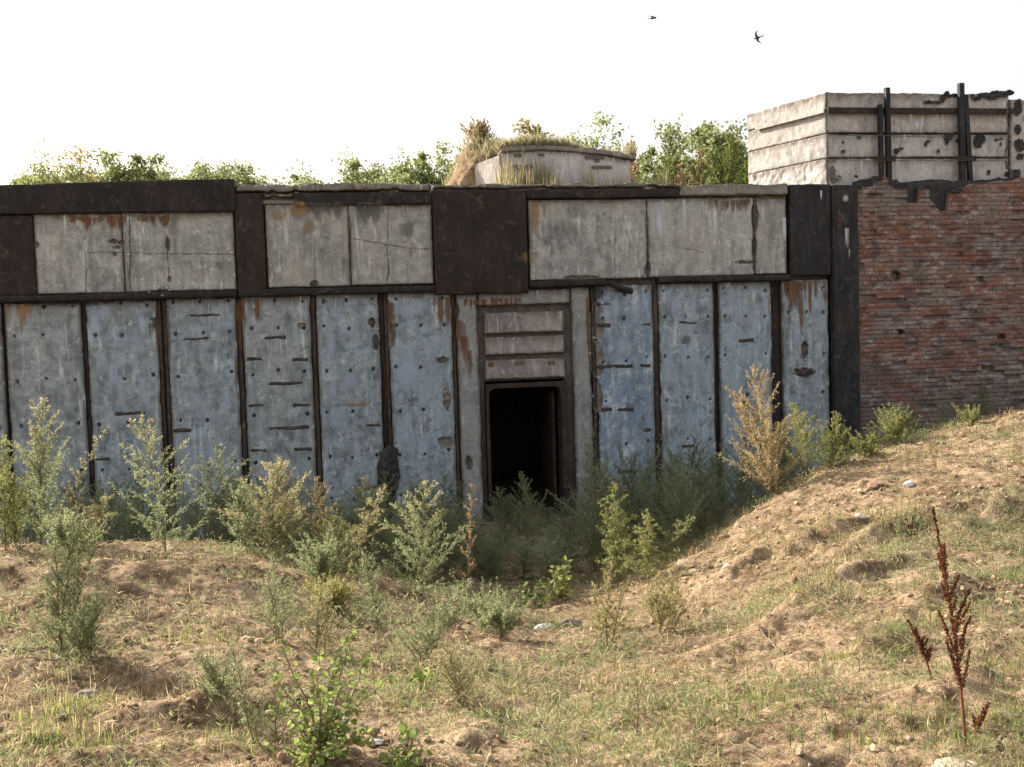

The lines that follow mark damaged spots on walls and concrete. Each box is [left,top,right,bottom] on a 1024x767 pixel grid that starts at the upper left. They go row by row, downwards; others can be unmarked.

corrosion [69,215,169,230]
crack [314,208,432,282]
corrosion [438,297,472,368]
corrosion [784,281,826,326]